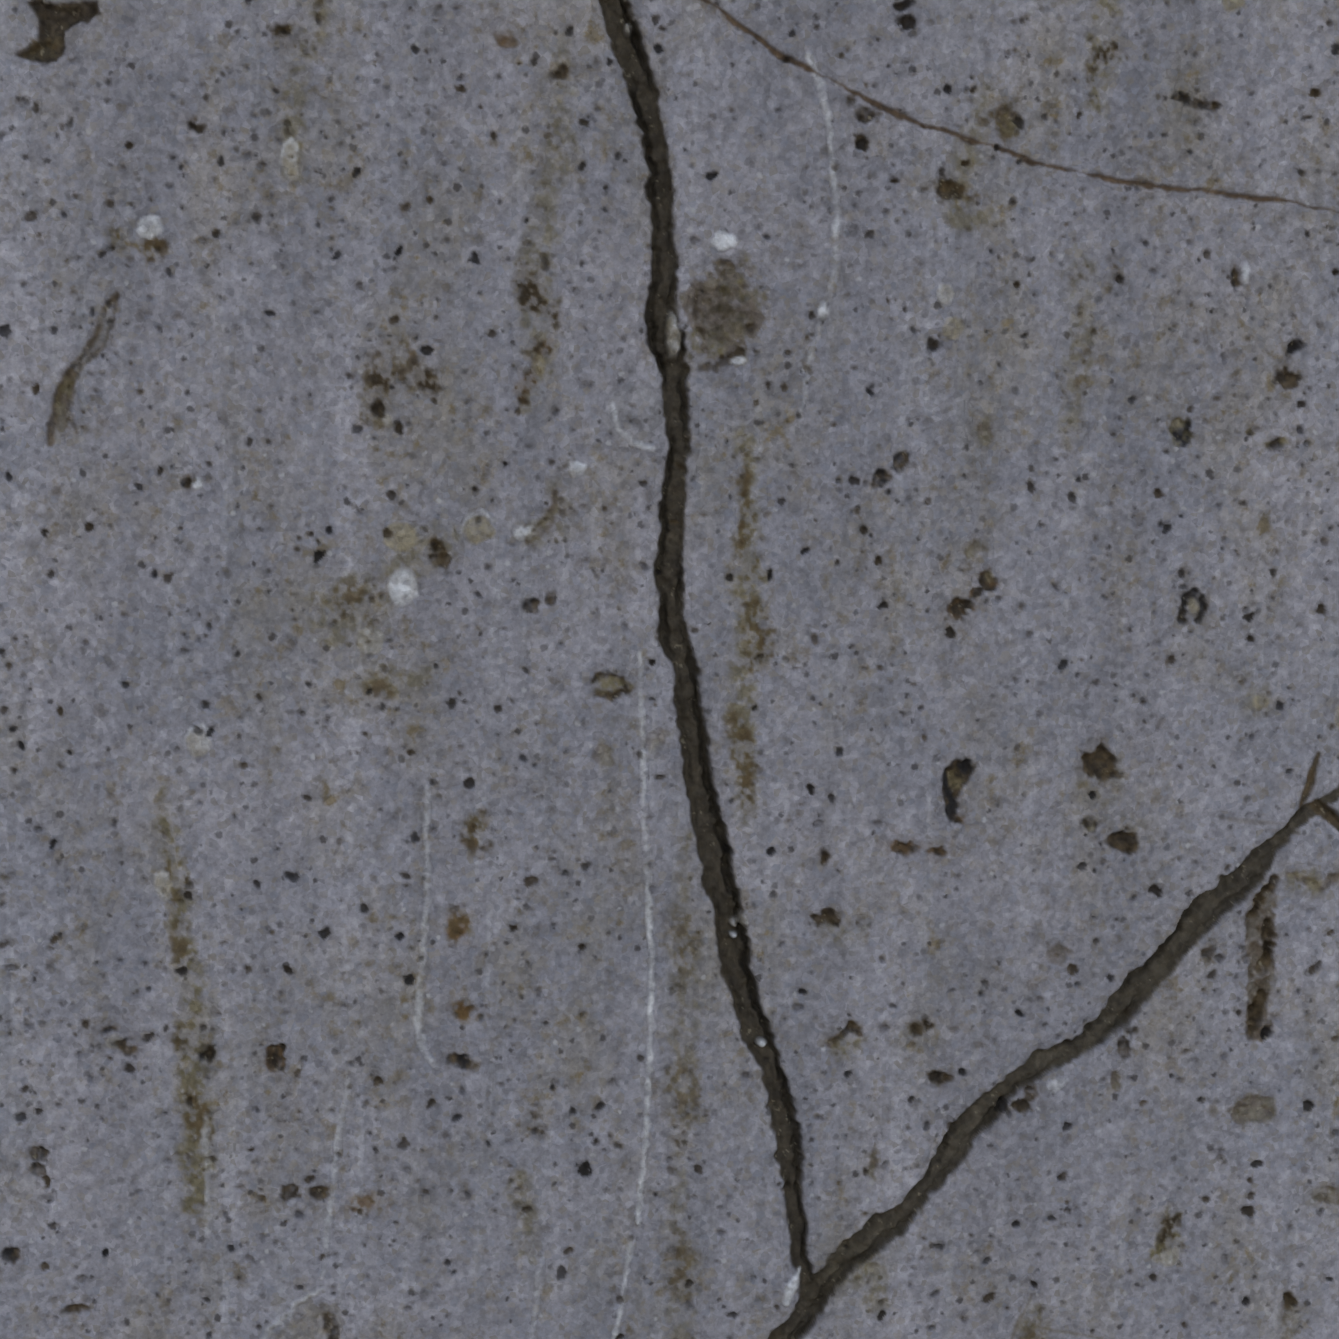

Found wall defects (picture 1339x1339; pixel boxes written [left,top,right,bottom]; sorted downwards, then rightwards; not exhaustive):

crack [591,0,1339,1339]